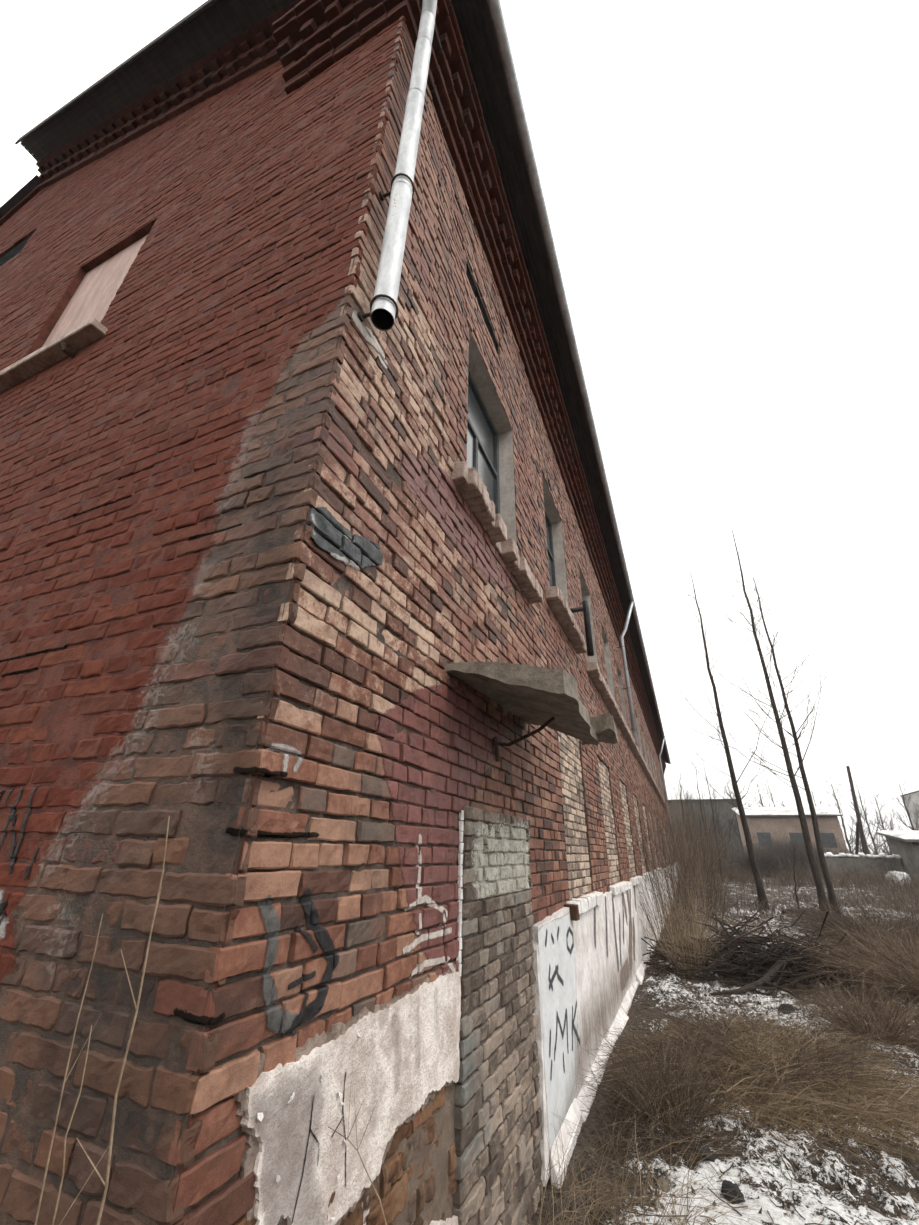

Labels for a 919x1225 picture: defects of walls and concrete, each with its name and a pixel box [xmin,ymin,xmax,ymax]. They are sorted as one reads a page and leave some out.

peeling [331,552,363,570]
peeling [0,287,353,1225]
flaking render [233,913,461,1225]